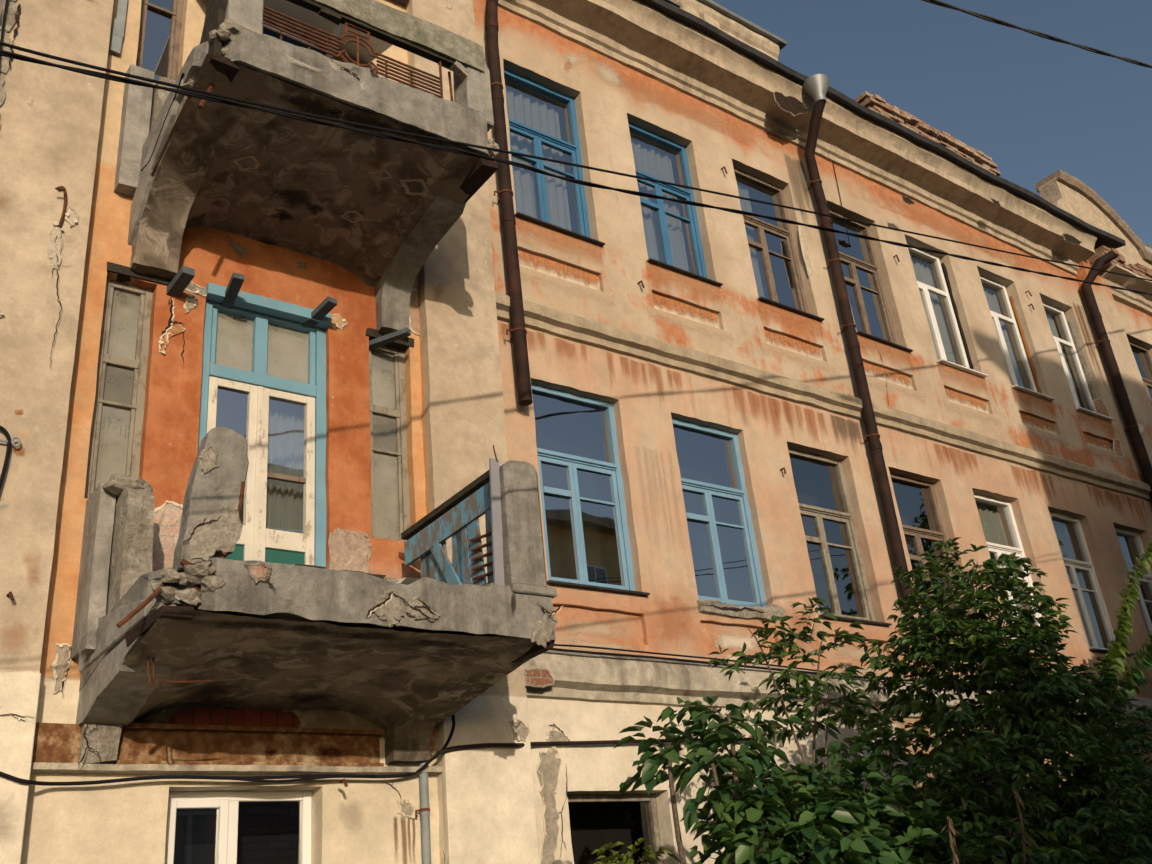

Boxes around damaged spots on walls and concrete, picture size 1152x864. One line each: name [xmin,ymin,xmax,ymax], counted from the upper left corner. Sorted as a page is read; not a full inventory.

spalling [0,0,21,106]
spalling [773,91,810,117]
crack [50,225,67,365]
spalling [158,282,213,355]
spalling [116,500,228,628]
spalling [374,588,441,627]
damp [197,621,336,653]
damp [350,634,462,668]
crack [0,706,34,721]
corrosion [317,746,341,758]
peeling [536,728,568,864]
corrosion [394,817,415,864]